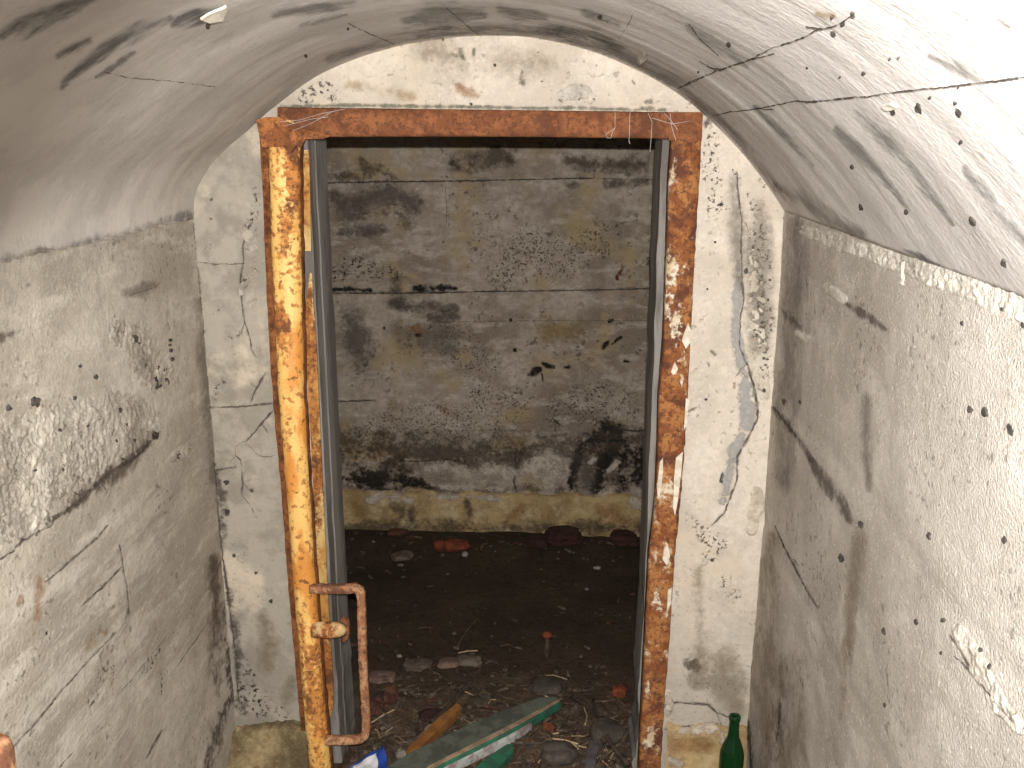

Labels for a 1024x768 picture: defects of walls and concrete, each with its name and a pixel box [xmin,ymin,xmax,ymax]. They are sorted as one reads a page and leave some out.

crack [105,72,214,87]
crack [678,13,854,89]
crack [714,76,1024,116]
water stain [331,158,423,236]
water stain [565,157,647,187]
water stain [487,223,613,287]
water stain [332,255,498,373]
water stain [527,362,570,382]
crack [715,172,800,522]
crack [188,218,274,689]
water stain [340,383,644,534]
spalling [940,618,1024,736]